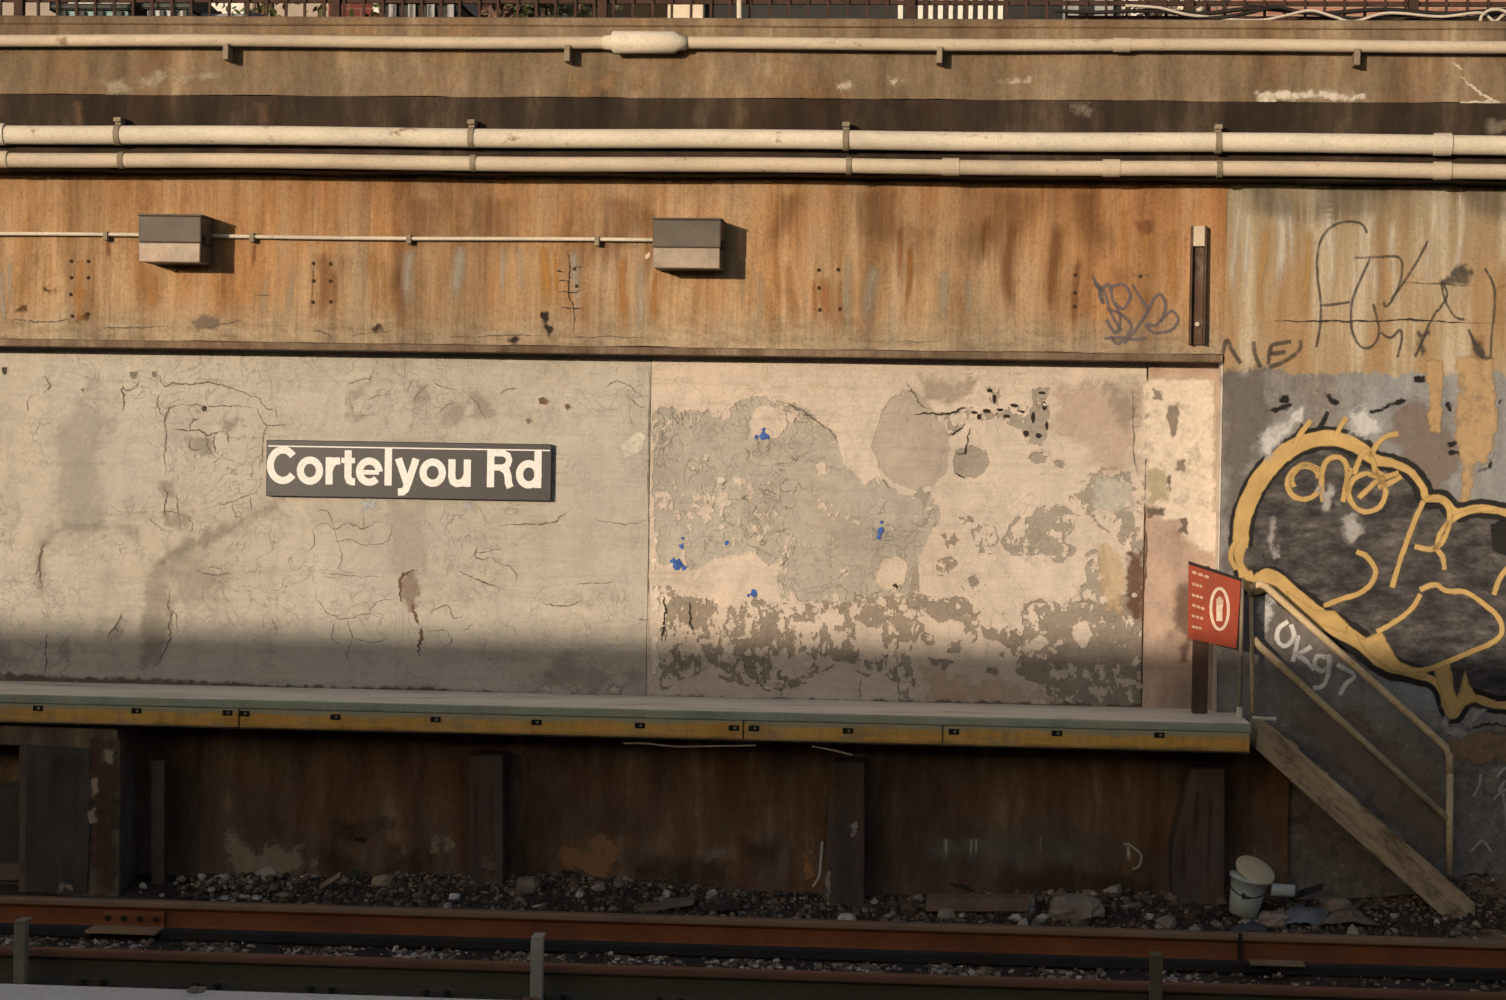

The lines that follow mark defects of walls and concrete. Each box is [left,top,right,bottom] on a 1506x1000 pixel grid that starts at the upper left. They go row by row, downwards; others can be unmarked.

crack [459,251,646,338]
rust [898,232,912,299]
rust [1003,227,1016,301]
rust [1048,229,1061,300]
crack [311,330,392,338]
crack [121,377,290,532]
crack [35,543,45,582]
crack [305,376,693,664]
peeling [620,369,1292,706]
crack [152,567,234,668]
rust [558,832,620,878]